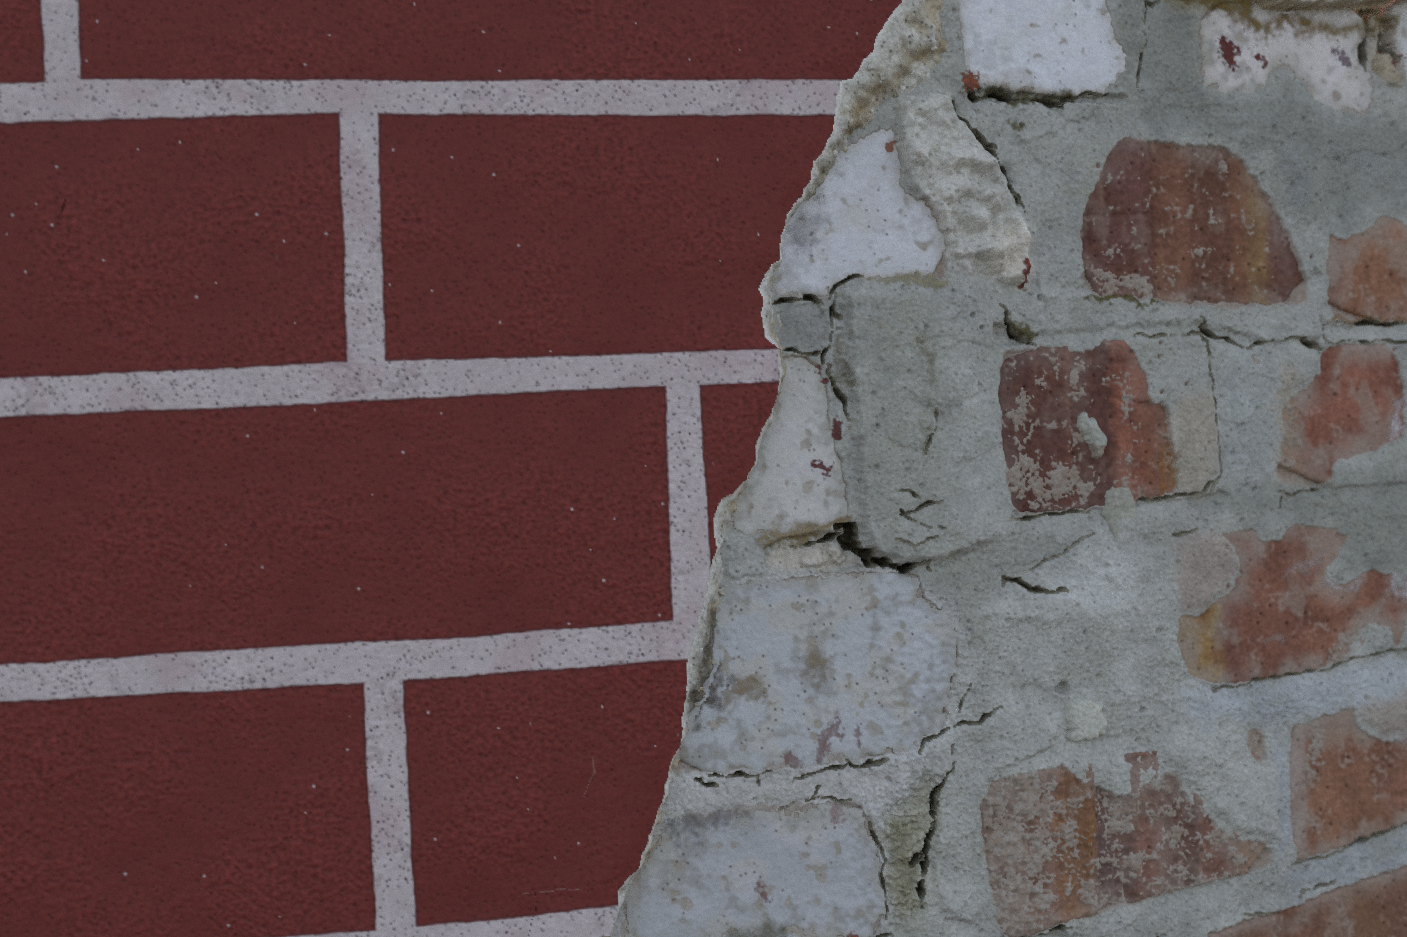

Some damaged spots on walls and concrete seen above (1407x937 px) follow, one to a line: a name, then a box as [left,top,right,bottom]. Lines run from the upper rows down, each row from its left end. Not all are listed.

crack [952,0,1160,213]
peeling [1199,0,1407,115]
crack [772,274,864,429]
peeling [602,0,1126,937]
crack [790,489,947,574]
crack [924,407,939,455]
crack [694,683,1003,937]